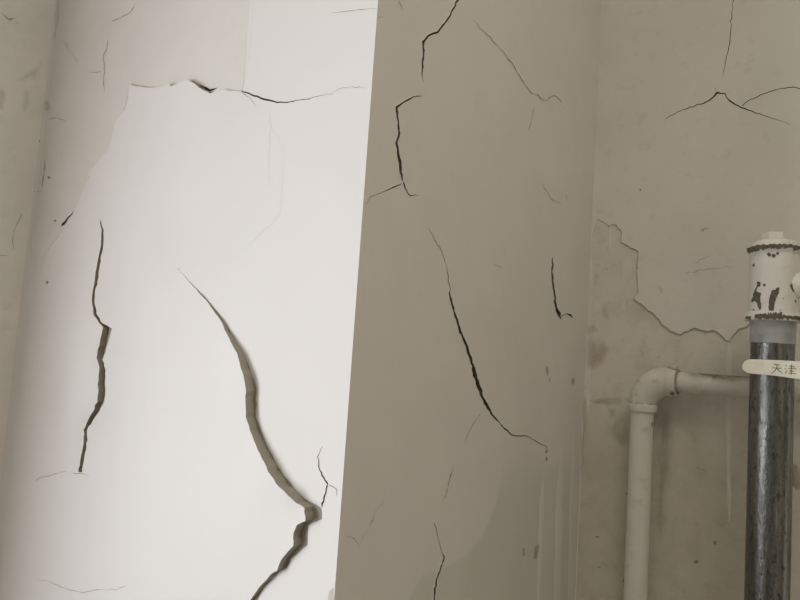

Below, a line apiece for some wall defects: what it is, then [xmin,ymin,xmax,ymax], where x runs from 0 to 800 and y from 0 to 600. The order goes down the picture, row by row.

crack [366,0,460,204]
crack [478,25,564,128]
crack [664,0,800,124]
crack [103,326,112,356]
crack [247,363,338,600]
crack [428,228,548,461]
crack [550,256,573,319]
peeling [576,218,750,600]
peeling [790,403,800,600]